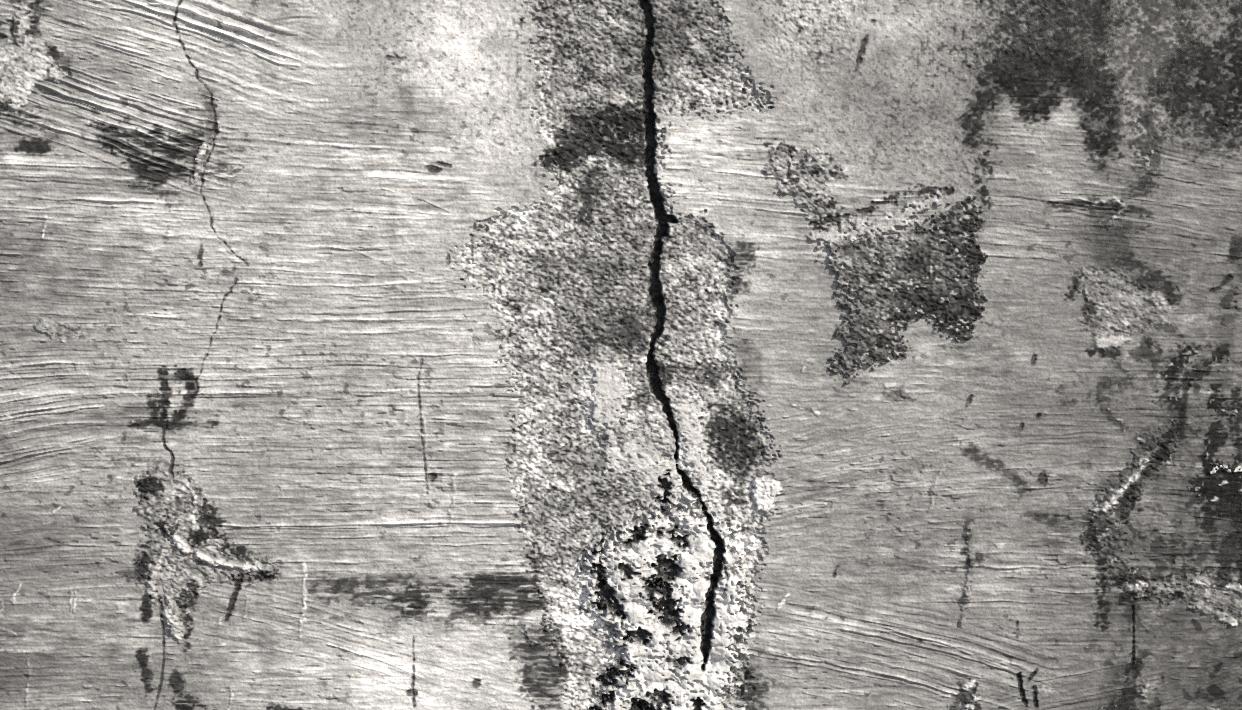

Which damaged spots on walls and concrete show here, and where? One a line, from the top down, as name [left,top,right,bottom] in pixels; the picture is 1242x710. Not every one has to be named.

crack [162,427,174,506]
water stain [128,365,219,430]
crack [173,0,248,395]
spalling [425,162,452,173]
spalling [446,0,782,710]
crack [638,0,728,710]
spalling [762,139,993,388]
water stain [955,0,1242,191]
water stain [1152,342,1242,591]
water stain [140,595,153,622]
water stain [169,670,216,710]
crack [150,536,273,710]